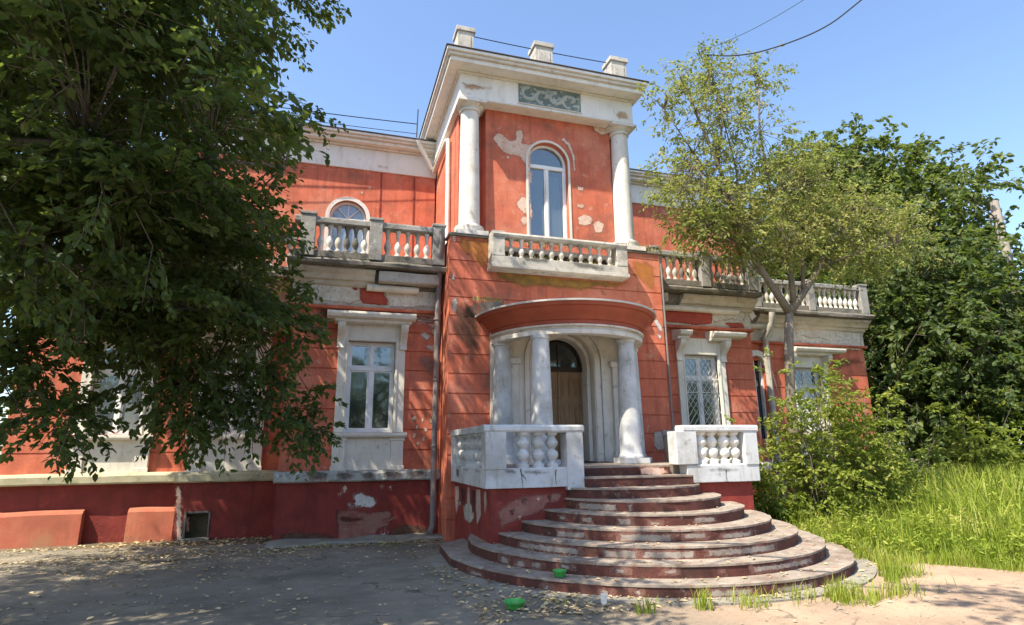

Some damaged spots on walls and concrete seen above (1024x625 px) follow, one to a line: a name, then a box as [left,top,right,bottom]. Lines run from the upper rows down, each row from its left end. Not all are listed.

spalling [494,130,532,182]
spalling [517,197,532,225]
spalling [577,204,604,232]
spalling [340,472,376,508]
spalling [459,502,474,523]
spalling [500,503,694,574]
spalling [709,531,775,557]